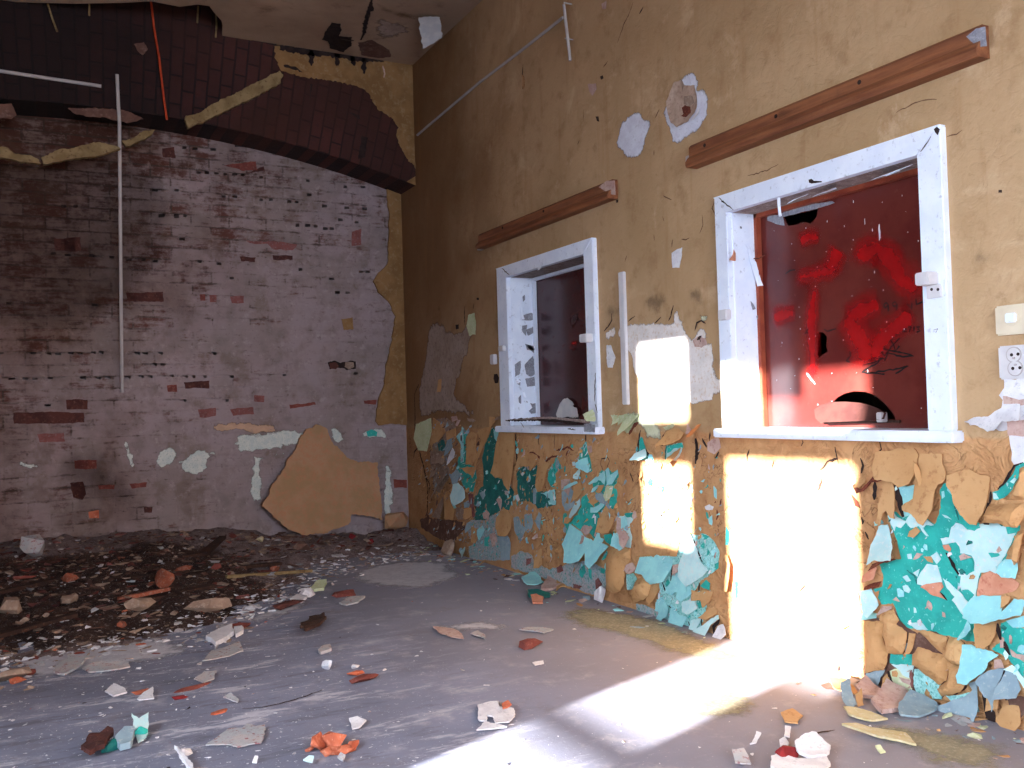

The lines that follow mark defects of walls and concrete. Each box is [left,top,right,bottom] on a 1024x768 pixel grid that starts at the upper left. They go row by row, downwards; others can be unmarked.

flaking render [0,0,416,182]
flaking render [664,73,707,143]
flaking render [617,113,650,157]
flaking render [126,292,164,302]
flaking render [167,381,209,392]
spalling [328,361,356,370]
flaking render [13,399,88,442]
flaking render [70,482,86,500]
peeling [156,447,215,474]
peeling [235,430,303,501]
peeling [384,305,738,639]
peeling [851,379,1024,731]